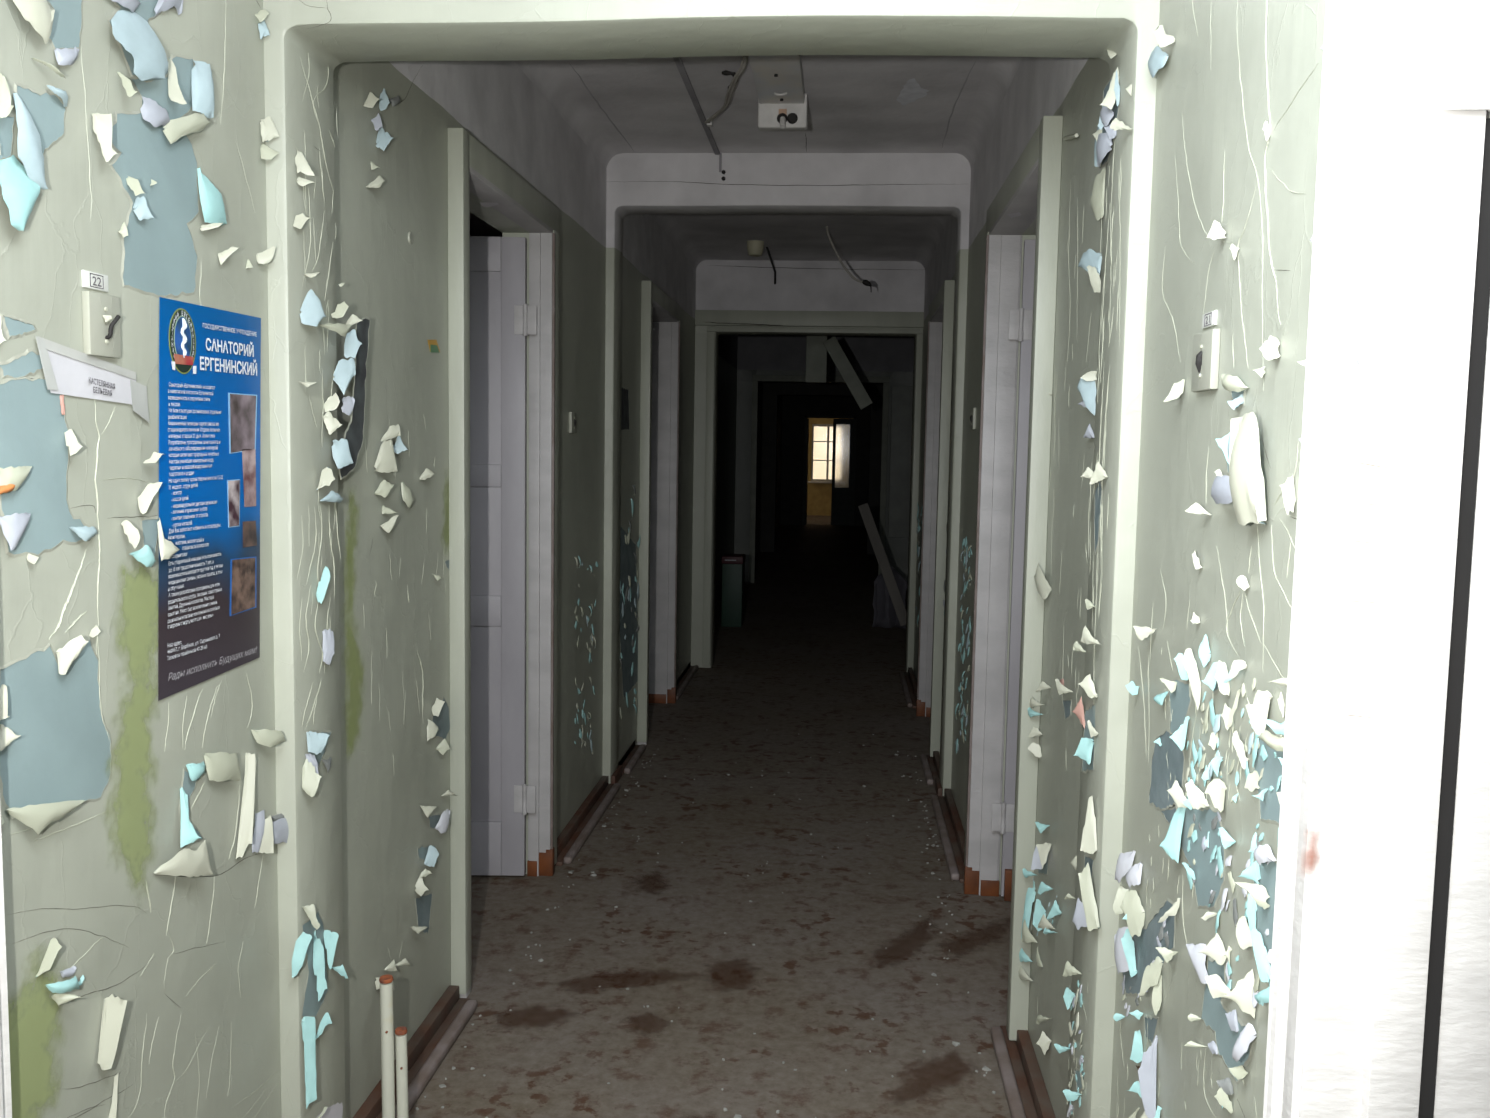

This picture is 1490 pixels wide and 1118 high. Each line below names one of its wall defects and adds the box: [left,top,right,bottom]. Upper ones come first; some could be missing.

peeling [0,0,83,231]
peeling [91,0,227,298]
peeling [260,55,435,555]
crack [1162,0,1316,391]
peeling [0,313,113,842]
mould [113,567,158,884]
peeling [105,452,180,568]
peeling [13,729,289,944]
crack [164,677,253,752]
peeling [1019,371,1302,1118]
crack [129,933,275,1117]
peeling [292,904,348,1118]